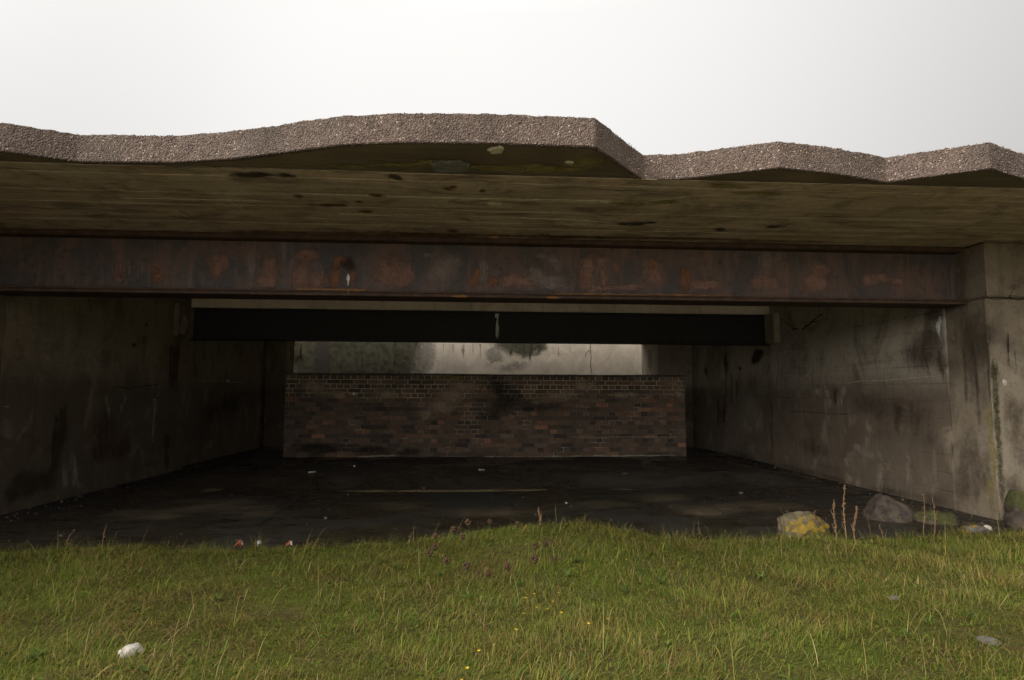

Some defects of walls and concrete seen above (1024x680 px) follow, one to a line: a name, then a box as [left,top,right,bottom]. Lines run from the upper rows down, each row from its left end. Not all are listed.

rust [479,259,725,299]
leakage [480,313,546,370]